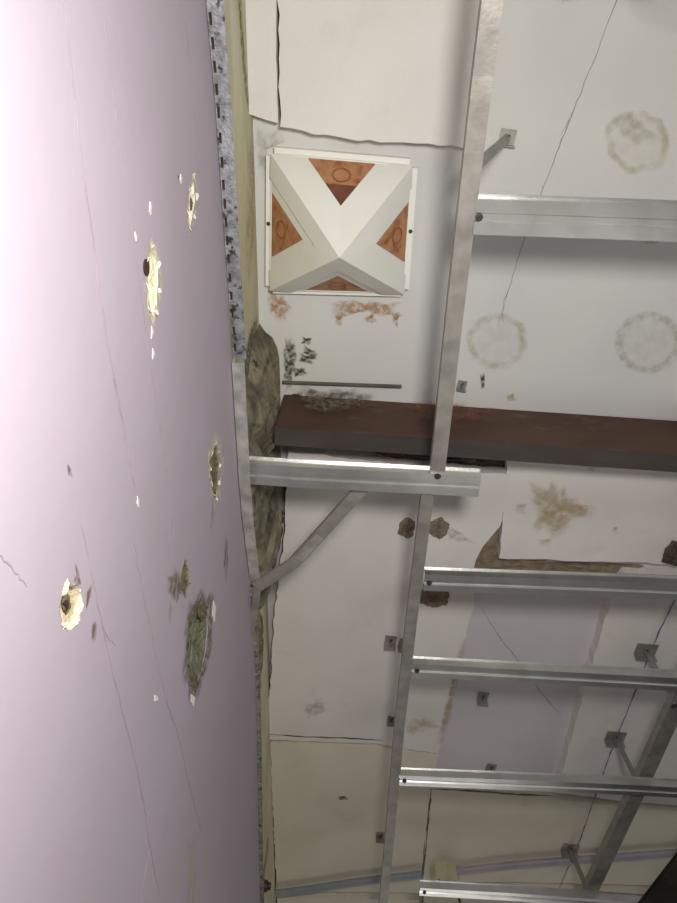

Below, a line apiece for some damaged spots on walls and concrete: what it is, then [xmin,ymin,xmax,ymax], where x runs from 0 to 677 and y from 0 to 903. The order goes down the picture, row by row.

peeling [180,173,199,231]
crack [63,0,137,498]
peeling [143,240,161,359]
rust [336,303,399,320]
damp [284,338,315,380]
peeling [245,320,402,458]
rust [452,405,481,418]
flaking render [208,434,224,508]
peeling [251,484,285,582]
damp [538,493,584,531]
flaking render [59,568,84,631]
flaking render [170,561,216,706]